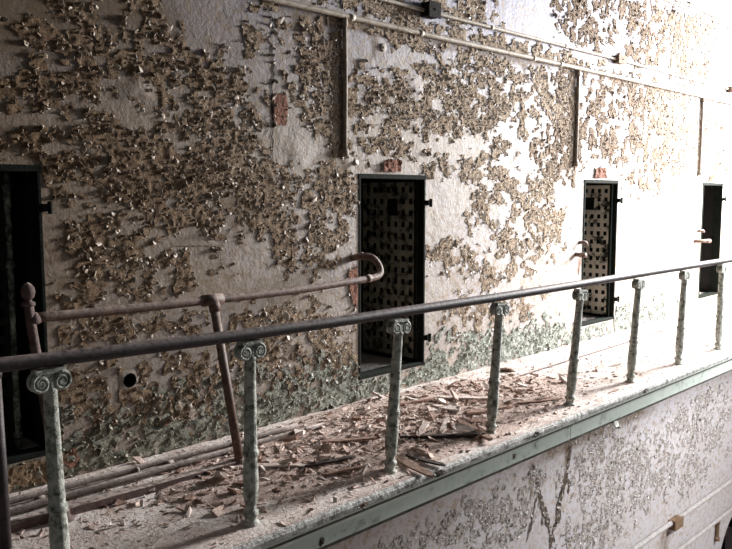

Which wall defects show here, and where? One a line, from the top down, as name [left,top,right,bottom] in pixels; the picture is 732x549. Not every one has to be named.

peeling [0,0,732,390]
peeling [58,342,244,478]
peeling [256,325,391,427]